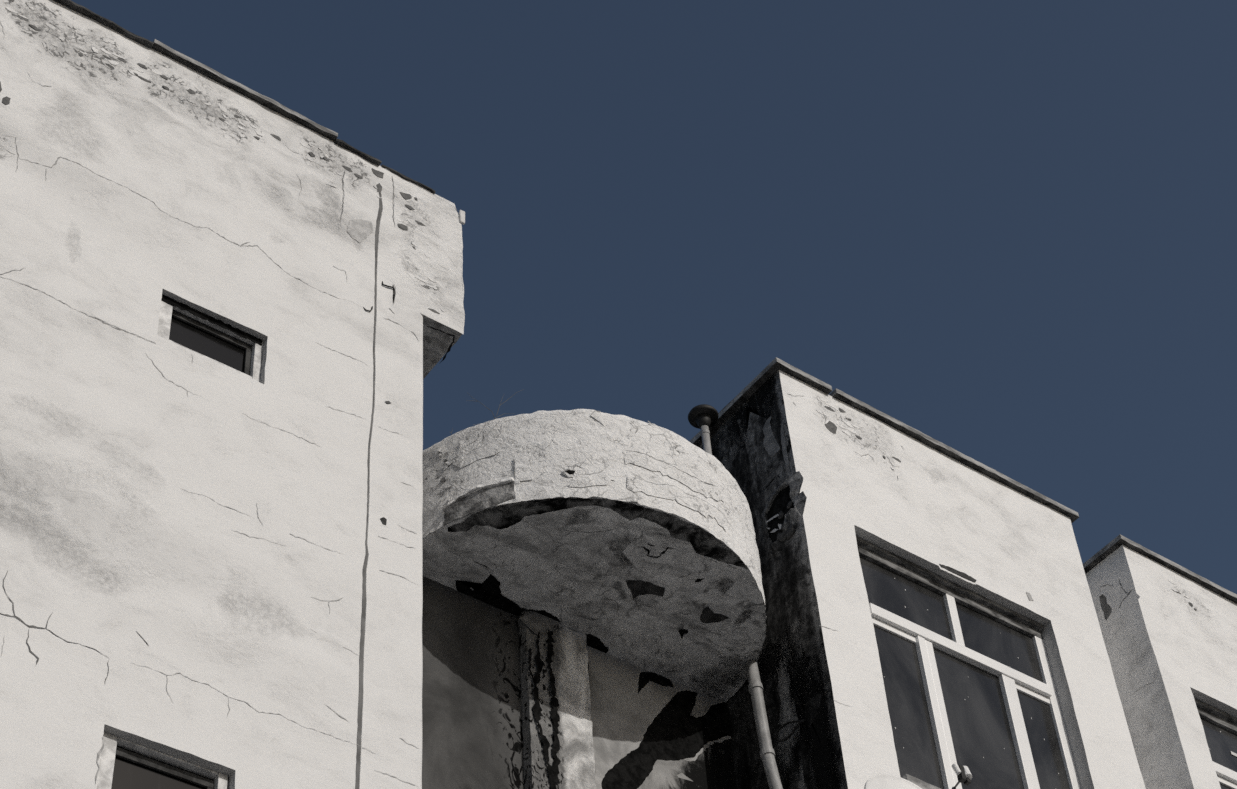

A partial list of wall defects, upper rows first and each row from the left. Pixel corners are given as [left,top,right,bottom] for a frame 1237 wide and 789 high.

peeling [5,0,386,199]
peeling [397,192,429,250]
crack [0,135,455,789]
crack [513,456,535,481]
spalling [436,448,749,571]
damp [728,371,778,444]
spalling [760,415,807,558]
spalling [451,571,612,736]
spalling [625,578,666,601]
spalling [677,604,731,639]
spalling [594,670,731,789]
damp [761,643,841,789]